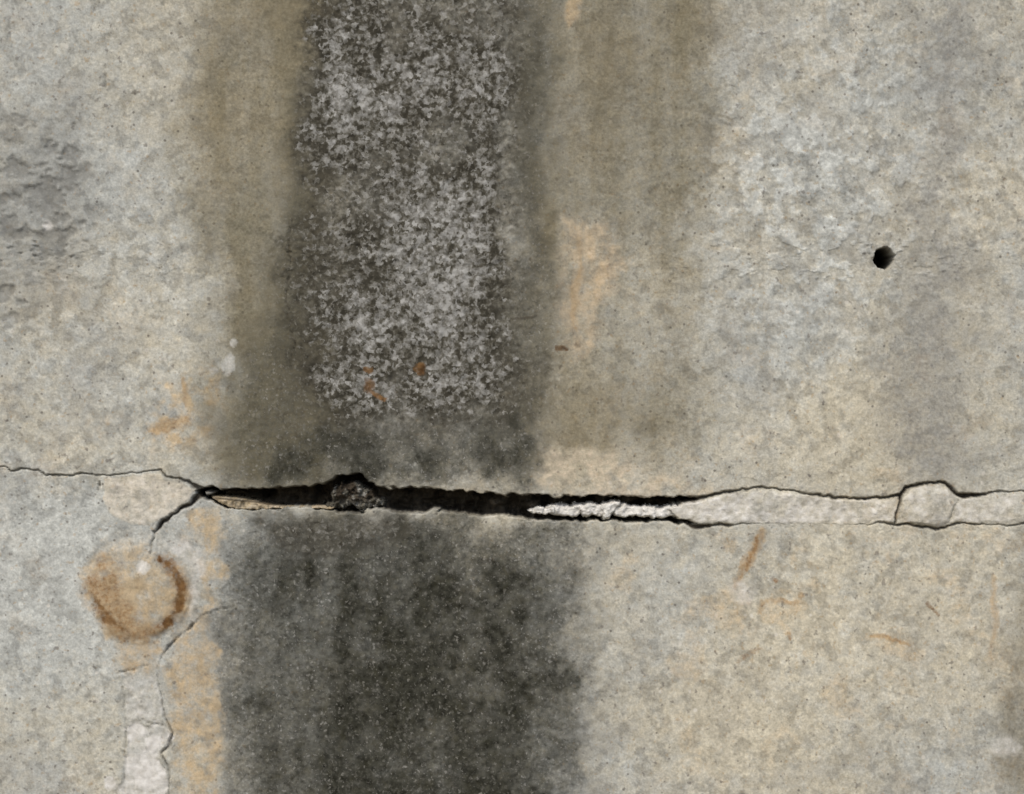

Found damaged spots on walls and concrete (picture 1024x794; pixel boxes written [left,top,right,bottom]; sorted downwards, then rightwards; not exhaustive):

water stain [144,0,759,496]
rust [80,503,232,794]
crack [112,601,246,794]
water stain [165,509,625,794]
crack [0,463,1024,558]